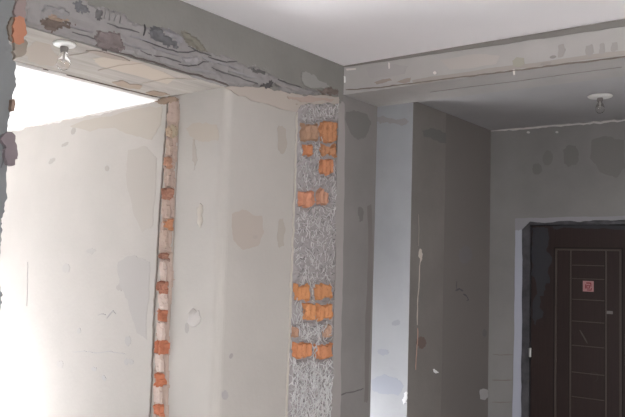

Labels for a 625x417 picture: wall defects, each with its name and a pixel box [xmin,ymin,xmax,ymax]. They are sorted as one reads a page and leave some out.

spalling [11,0,328,95]
crack [107,23,258,86]
flaking render [154,96,179,105]
flaking render [161,188,175,200]
spalling [288,103,339,417]
flaking render [156,281,169,294]
flaking render [157,309,168,322]
flaking render [154,340,170,355]
flaking render [153,372,167,387]
flaking render [153,404,165,417]